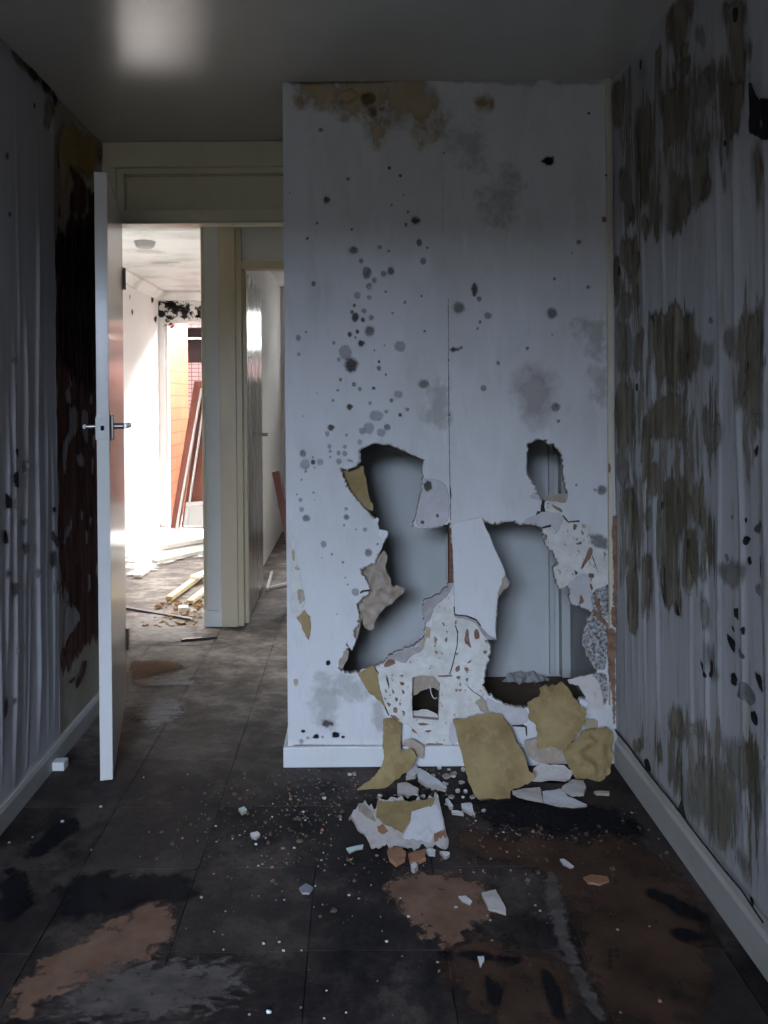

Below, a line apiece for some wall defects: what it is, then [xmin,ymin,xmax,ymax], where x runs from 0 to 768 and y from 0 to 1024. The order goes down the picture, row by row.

leakage [292,81,443,147]
mould [348,304,387,376]
leakage [611,0,766,635]
mould [332,359,357,402]
peeling [358,585,528,745]
peeling [523,501,616,705]
leakage [700,646,716,679]
mould [727,608,745,659]
flaking render [420,765,475,799]
leakage [633,672,762,883]
leakage [52,870,200,918]
leakage [440,951,521,964]